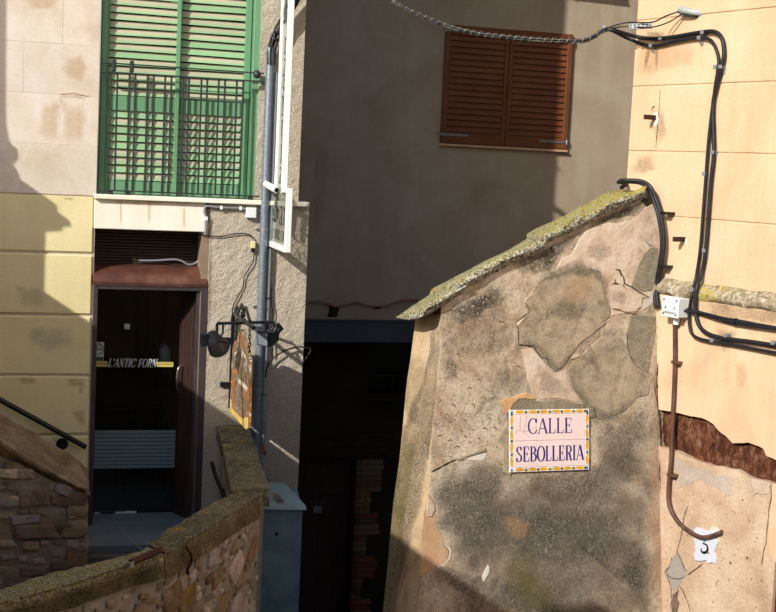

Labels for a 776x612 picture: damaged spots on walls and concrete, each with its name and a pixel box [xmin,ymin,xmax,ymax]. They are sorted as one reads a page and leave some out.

flaking render [484,393,535,414]
flaking render [665,554,686,612]